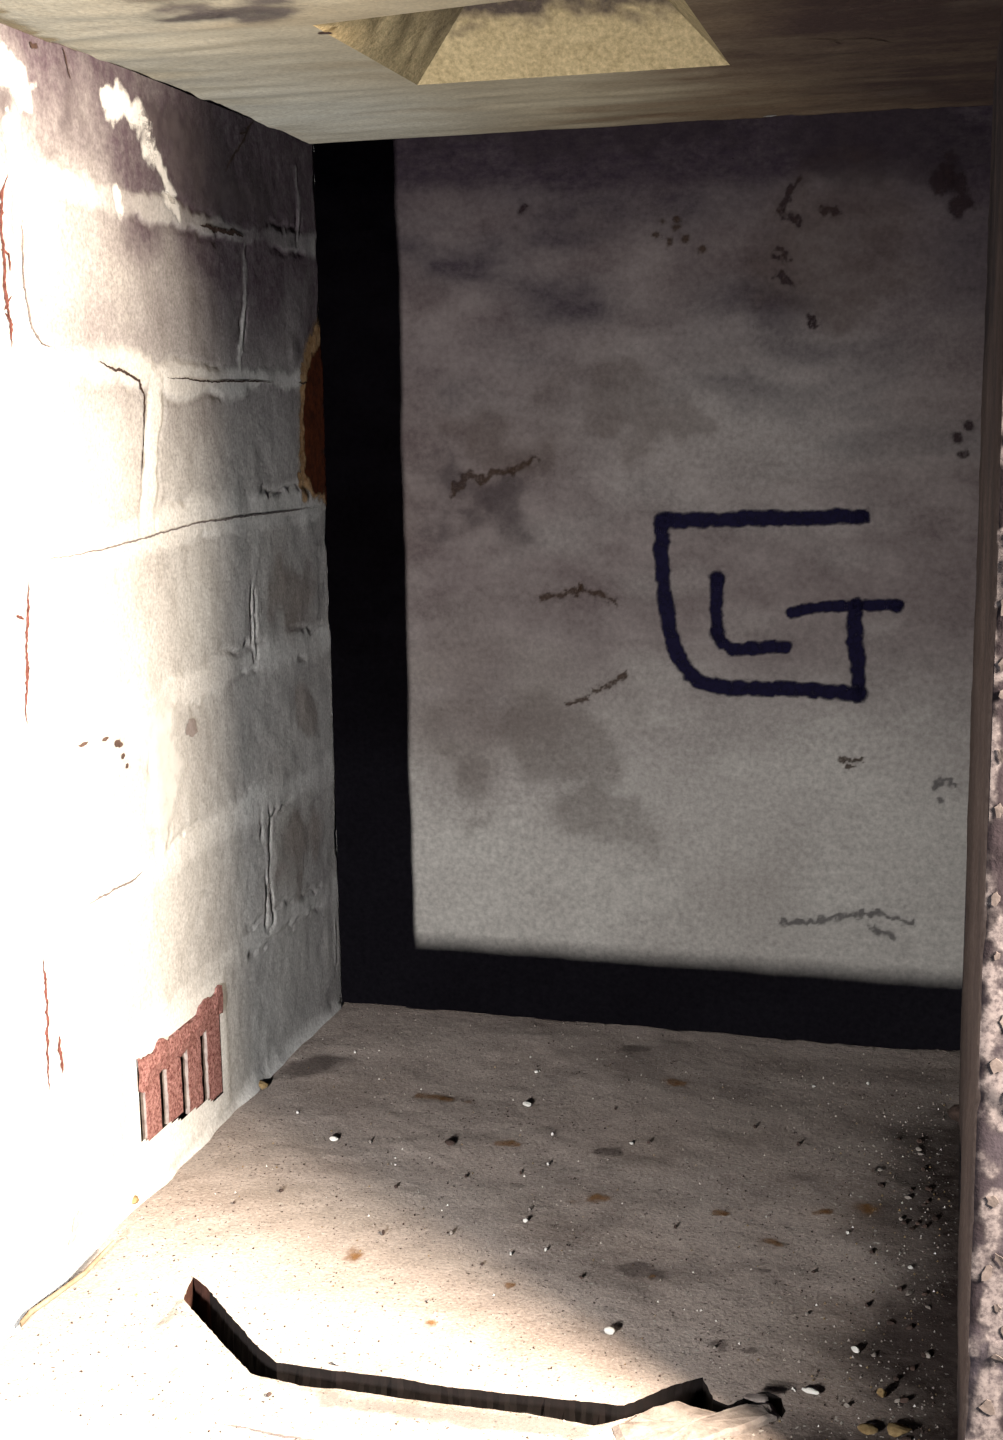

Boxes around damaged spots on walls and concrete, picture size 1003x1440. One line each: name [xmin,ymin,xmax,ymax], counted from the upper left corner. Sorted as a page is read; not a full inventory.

leakage [0,11,56,42]
leakage [112,185,123,216]
leakage [776,177,802,227]
crack [0,177,52,353]
rust [297,323,327,504]
leakage [954,420,973,458]
leakage [452,457,536,496]
leakage [539,584,616,605]
leakage [566,671,627,705]